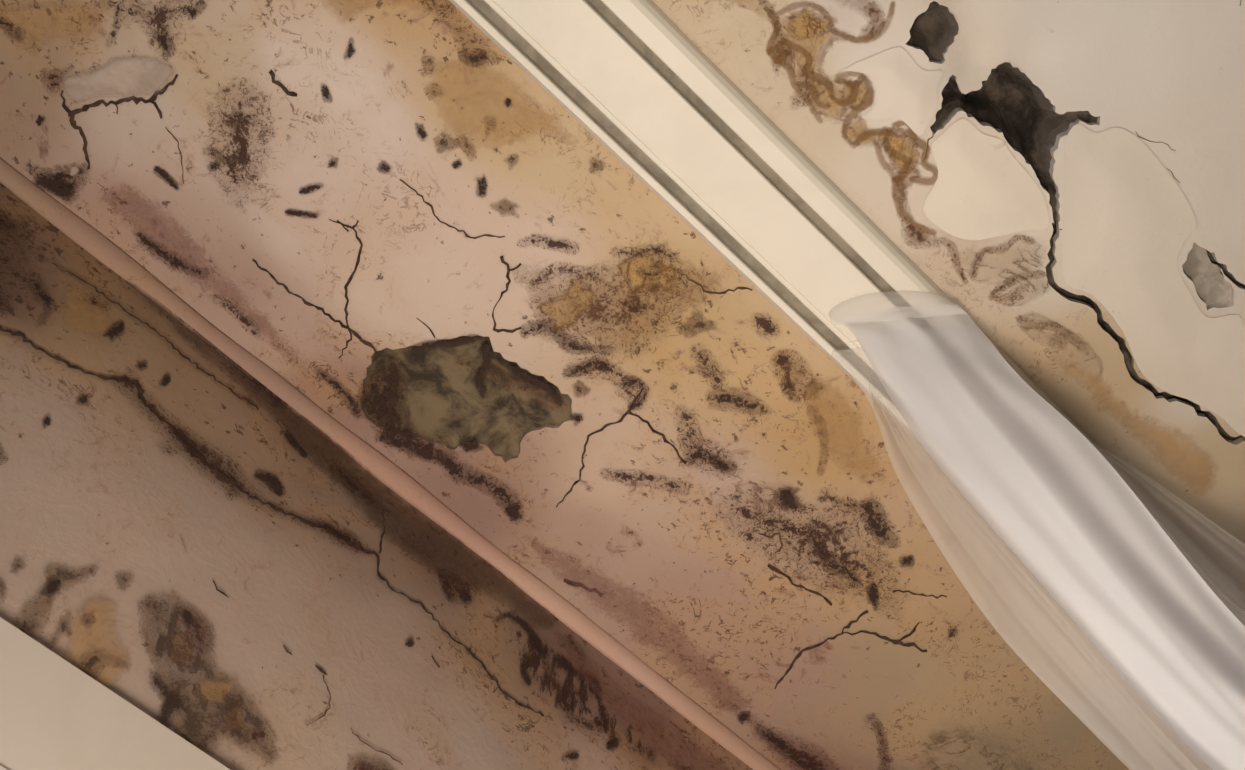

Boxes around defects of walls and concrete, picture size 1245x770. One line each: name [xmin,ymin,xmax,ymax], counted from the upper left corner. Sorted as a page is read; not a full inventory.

hole [907,1,959,62]
crack [60,74,184,185]
damp [758,0,939,249]
hole [930,62,1098,224]
crack [252,219,377,358]
spalling [361,335,574,460]
damp [506,234,765,418]
crack [1045,218,1245,441]
spalling [1182,242,1231,306]
damp [113,283,656,765]
damp [674,406,913,622]
crack [758,533,947,689]